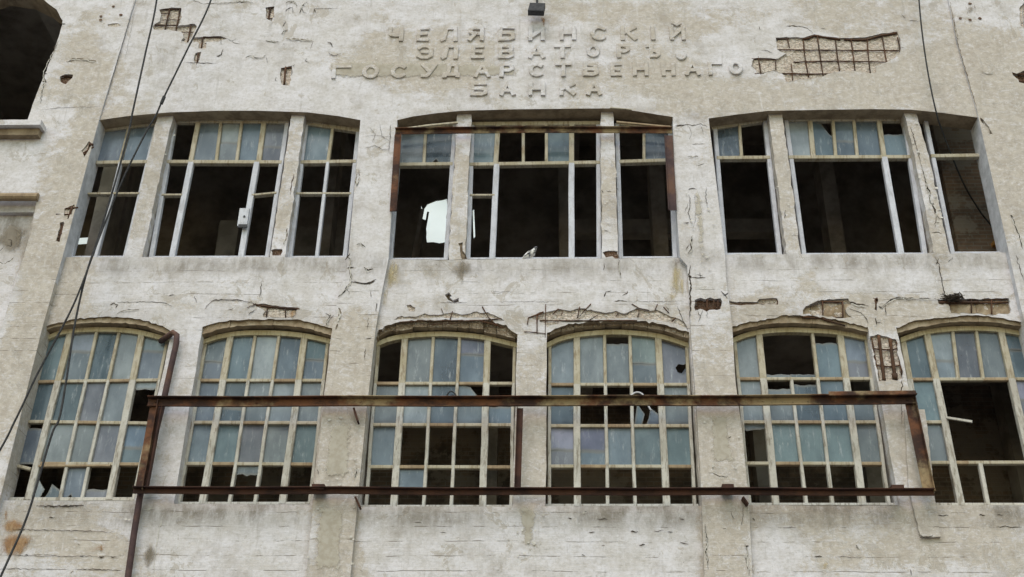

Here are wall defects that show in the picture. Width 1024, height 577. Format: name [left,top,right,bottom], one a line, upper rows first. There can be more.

spalling [153,8,224,65]
spalling [280,66,292,86]
spalling [752,32,901,82]
crack [910,127,940,233]
crack [603,123,728,330]
crack [325,243,377,358]
spalling [694,298,778,312]
spalling [802,300,850,326]
spalling [938,299,1008,315]
spalling [869,335,903,381]